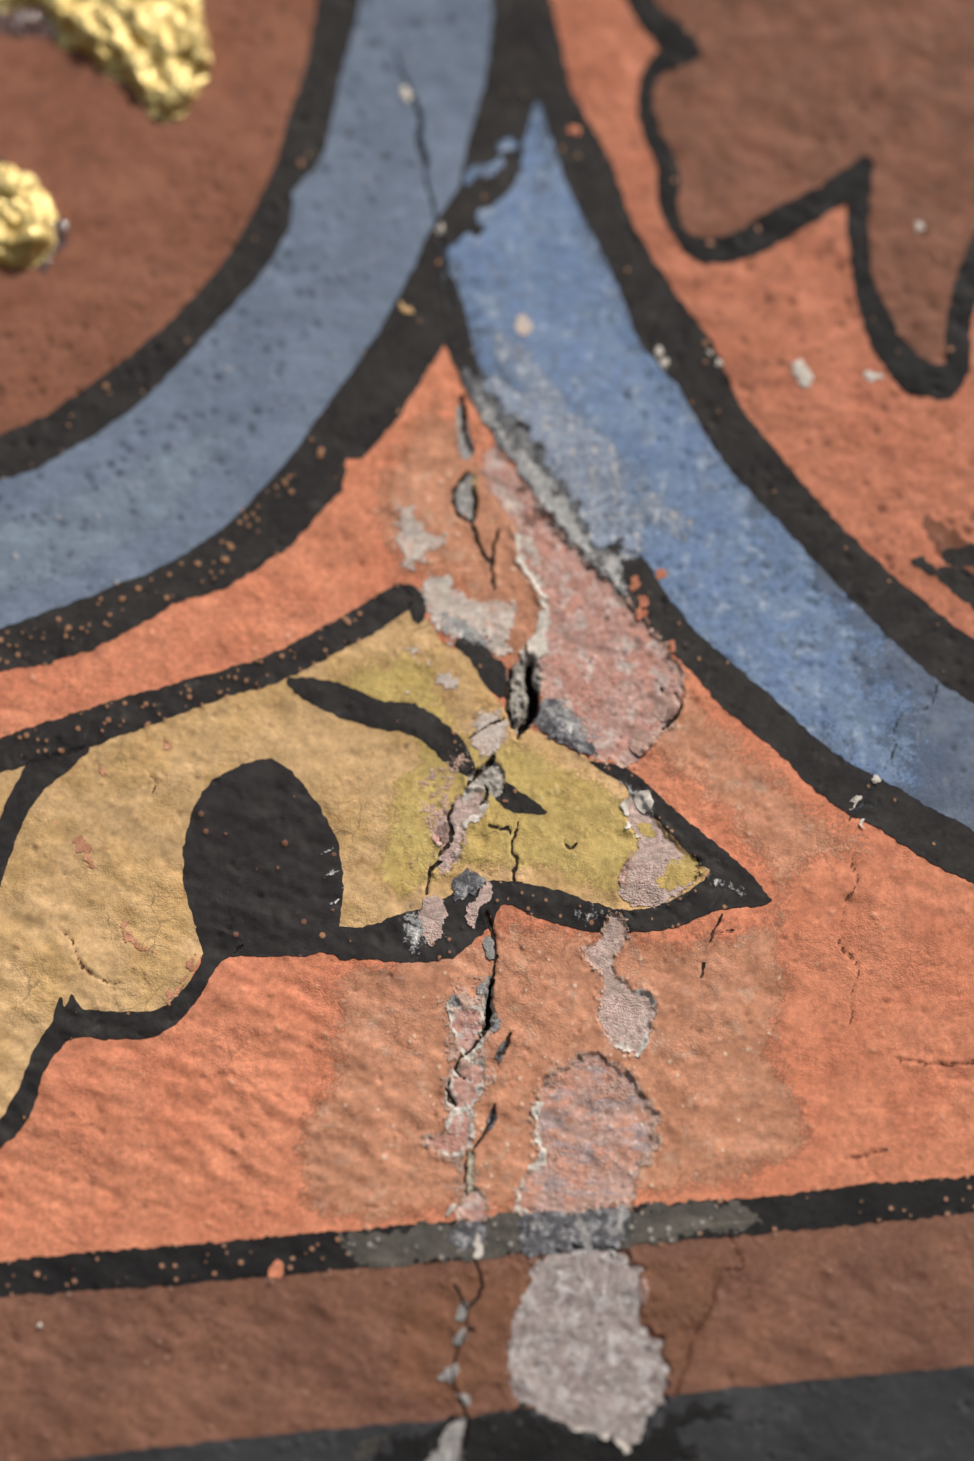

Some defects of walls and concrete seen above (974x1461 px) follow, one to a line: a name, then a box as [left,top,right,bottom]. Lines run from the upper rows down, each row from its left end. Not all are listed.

crack [375,58,453,309]
crack [451,394,500,591]
peeling [481,446,688,768]
peeling [432,762,505,875]
crack [426,655,543,894]
peeling [421,981,507,1159]
peeling [446,1186,493,1258]
crack [445,911,512,1198]
peeling [505,790,704,1453]
peeling [426,1300,471,1461]
crack [451,1259,484,1461]
damp [352,1400,732,1461]